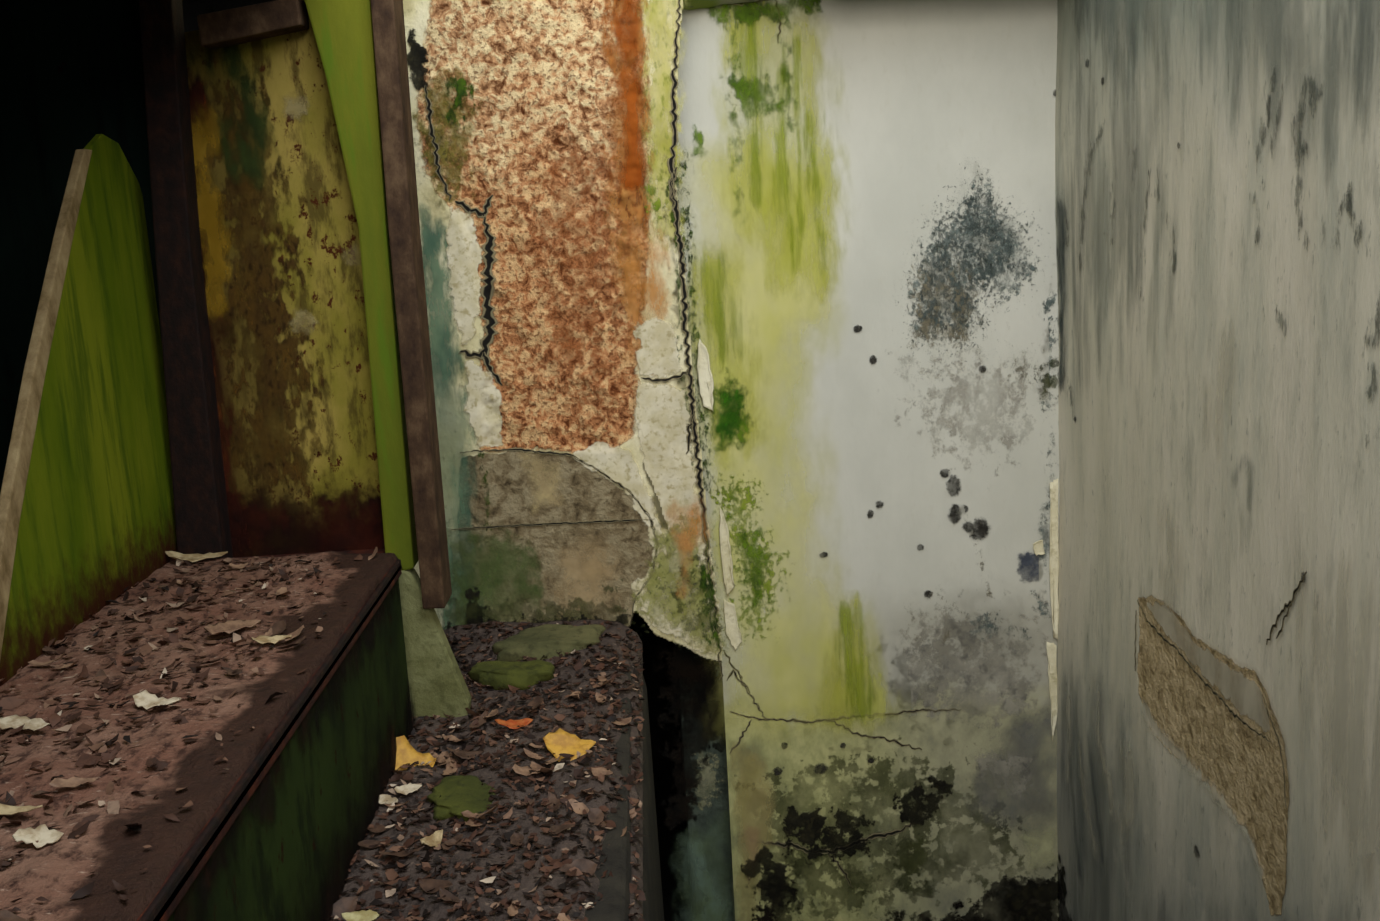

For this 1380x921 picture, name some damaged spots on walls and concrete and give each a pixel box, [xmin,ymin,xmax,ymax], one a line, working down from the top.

rust [174,582,398,921]
rust [189,45,385,558]
rust [365,685,415,837]
crack [424,85,502,386]
spalling [416,0,742,653]
crack [641,0,961,753]
damp [735,504,1072,921]
damp [940,470,989,546]
damp [897,172,1087,451]
flaking render [1033,479,1059,742]
spalling [1134,595,1290,916]
damp [1256,69,1322,160]